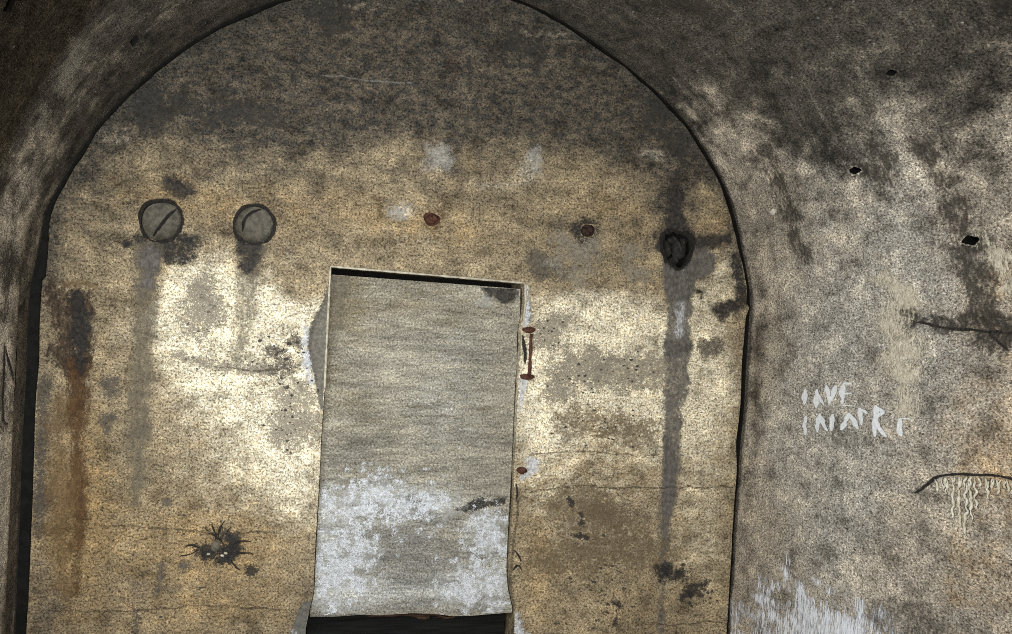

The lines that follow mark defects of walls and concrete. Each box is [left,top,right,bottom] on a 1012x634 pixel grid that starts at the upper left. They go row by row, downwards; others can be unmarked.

corrosion [32,278,96,592]
water stain [313,462,530,634]
water stain [653,172,746,634]
water stain [730,553,896,634]
water stain [864,266,930,417]
crack [900,309,1012,356]
water stain [914,473,1012,537]